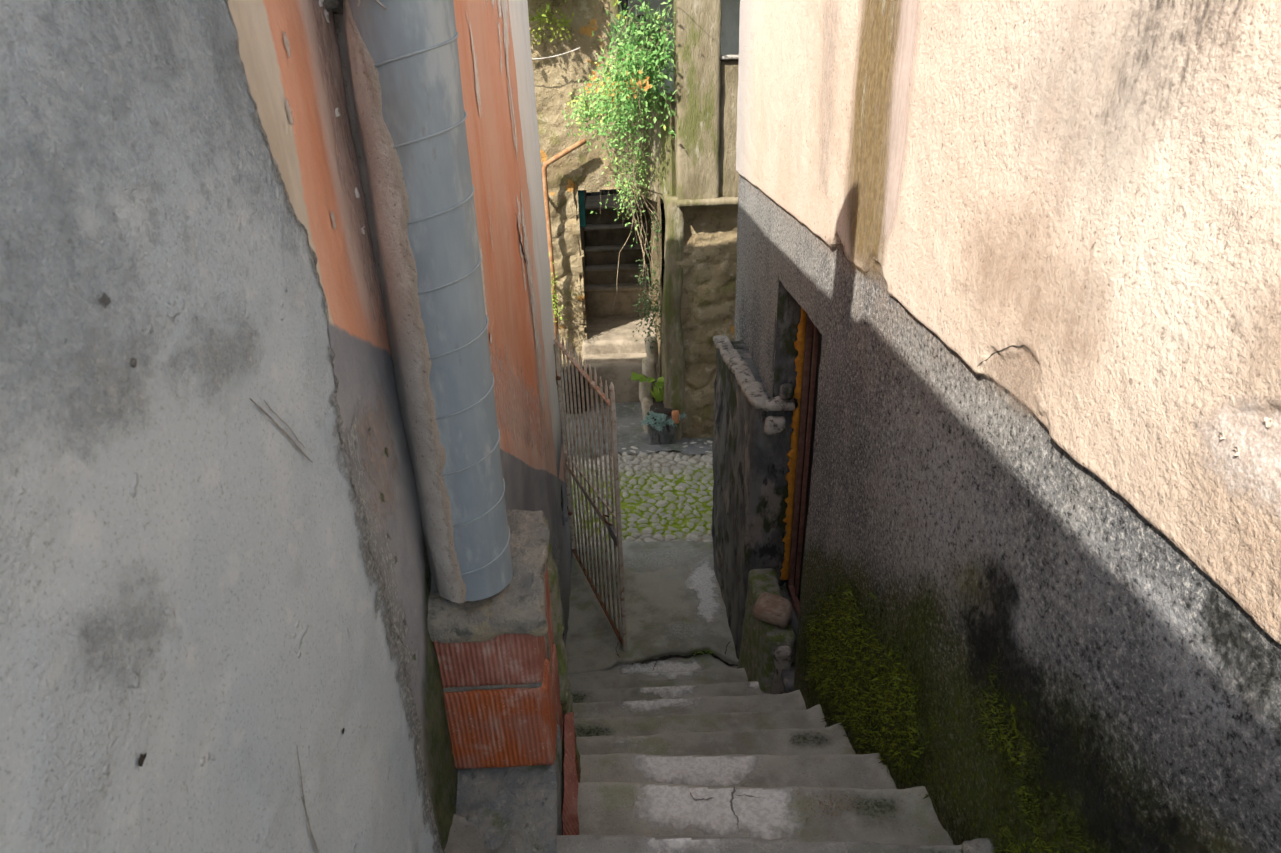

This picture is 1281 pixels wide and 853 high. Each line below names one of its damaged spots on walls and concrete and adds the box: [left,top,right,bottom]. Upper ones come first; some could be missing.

peeling [467,7,482,118]
peeling [485,0,518,162]
leakage [1105,0,1239,120]
spalling [1195,400,1281,511]
leakage [962,560,1202,853]
leakage [1207,592,1281,730]
crack [690,779,760,831]